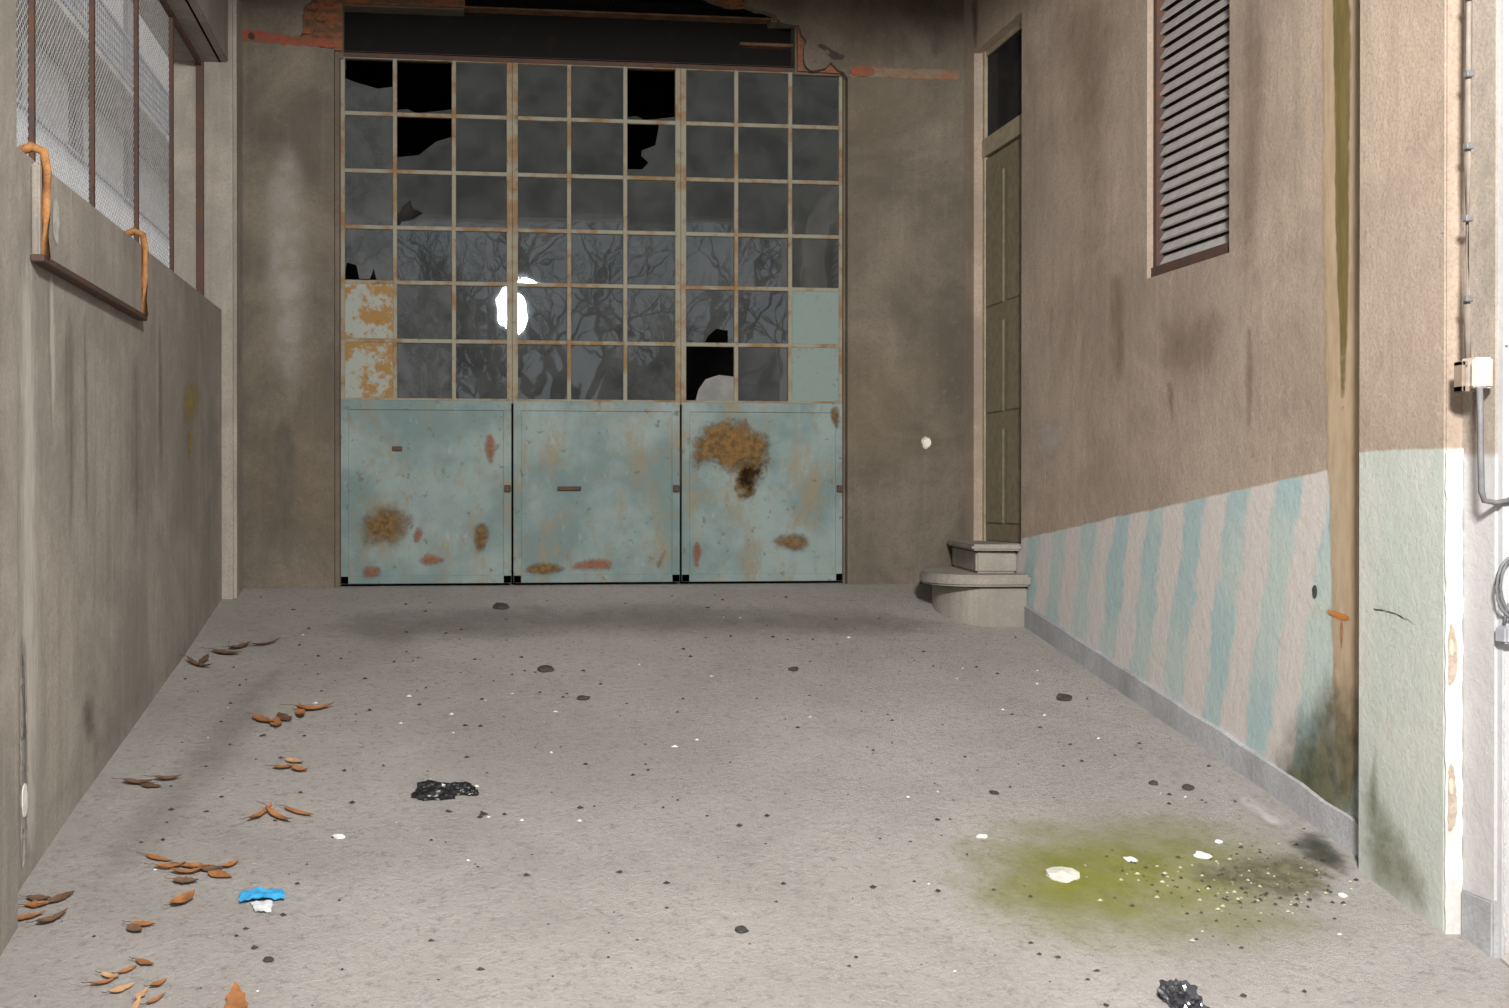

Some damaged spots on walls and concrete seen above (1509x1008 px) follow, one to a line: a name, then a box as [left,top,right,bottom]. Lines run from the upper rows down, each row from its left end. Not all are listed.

spalling [243,0,465,52]
spalling [715,0,747,10]
spalling [797,28,959,80]
rust [694,422,768,497]
rust [365,509,421,541]
peeling [1444,449,1463,934]